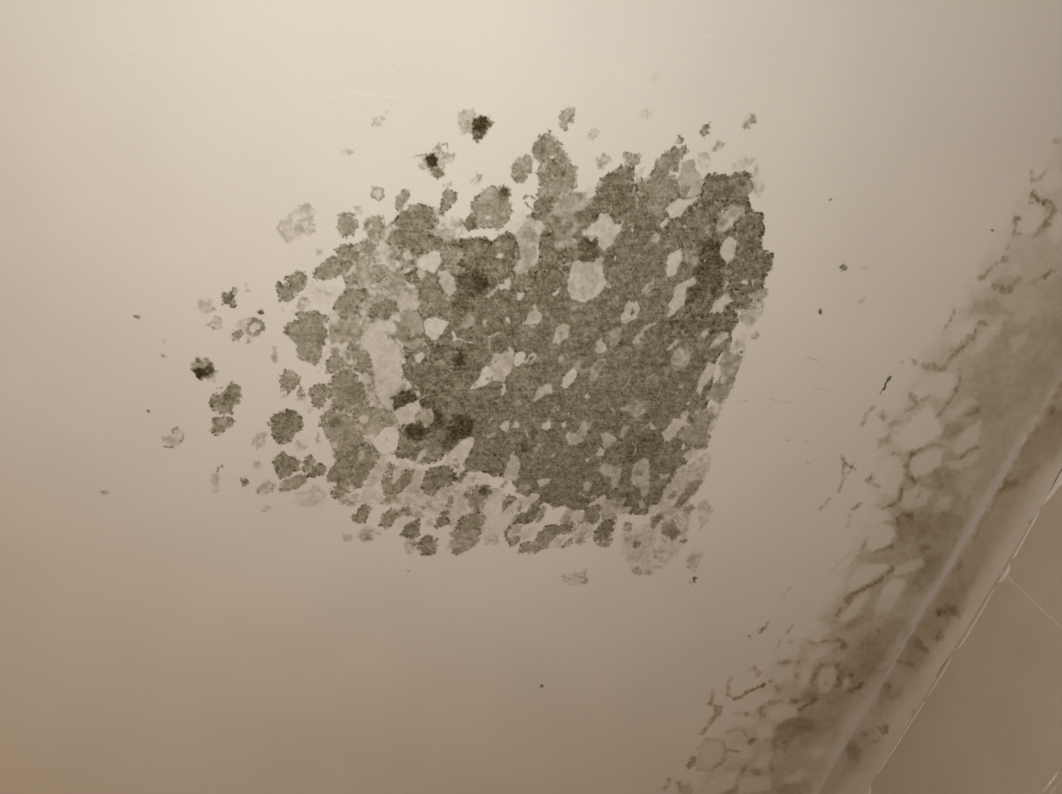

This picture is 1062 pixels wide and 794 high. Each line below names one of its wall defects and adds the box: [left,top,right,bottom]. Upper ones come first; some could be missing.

mould [472,115,492,142]
mould [193,358,214,380]
damp [271,136,774,555]
damp [210,387,235,434]